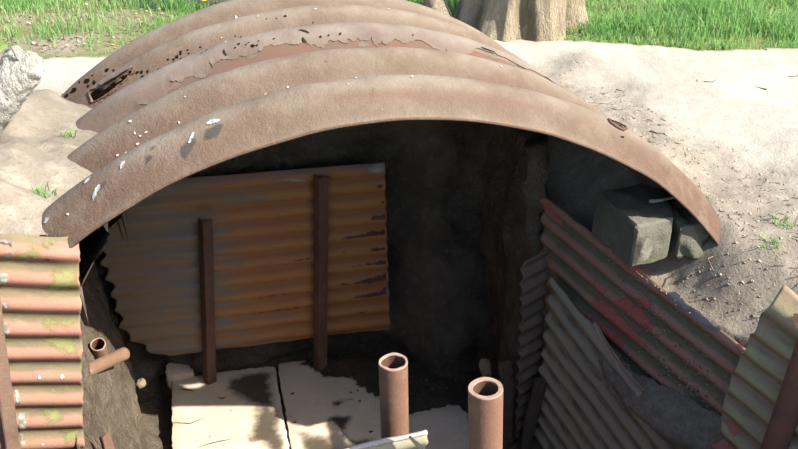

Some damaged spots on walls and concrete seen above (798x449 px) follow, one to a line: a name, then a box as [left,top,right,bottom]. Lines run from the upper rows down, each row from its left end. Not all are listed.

rust [76,22,568,133]
spalling [615,237,652,278]
peeling [585,280,653,350]
peeling [665,292,721,331]
water stain [231,373,283,449]
water stain [303,416,368,449]